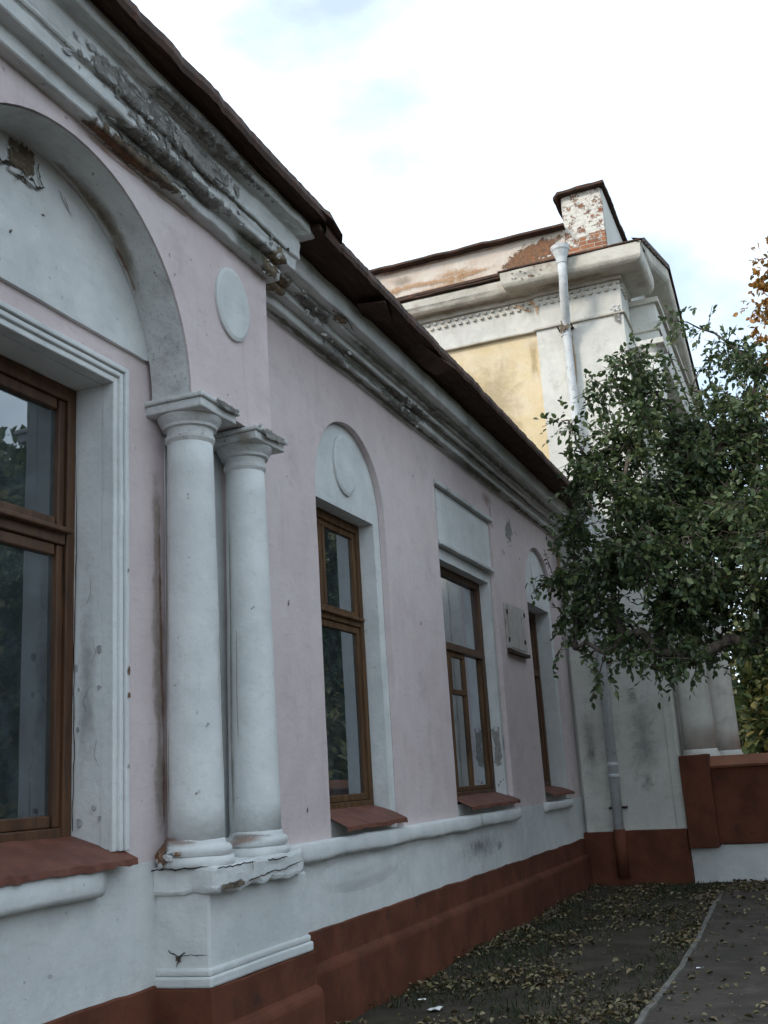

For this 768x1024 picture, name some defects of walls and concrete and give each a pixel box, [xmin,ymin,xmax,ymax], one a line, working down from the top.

spalling [61,31,276,226]
spalling [0,137,46,190]
flaking render [497,234,563,279]
spalling [261,234,354,337]
crack [151,856,288,872]
crack [168,950,208,968]